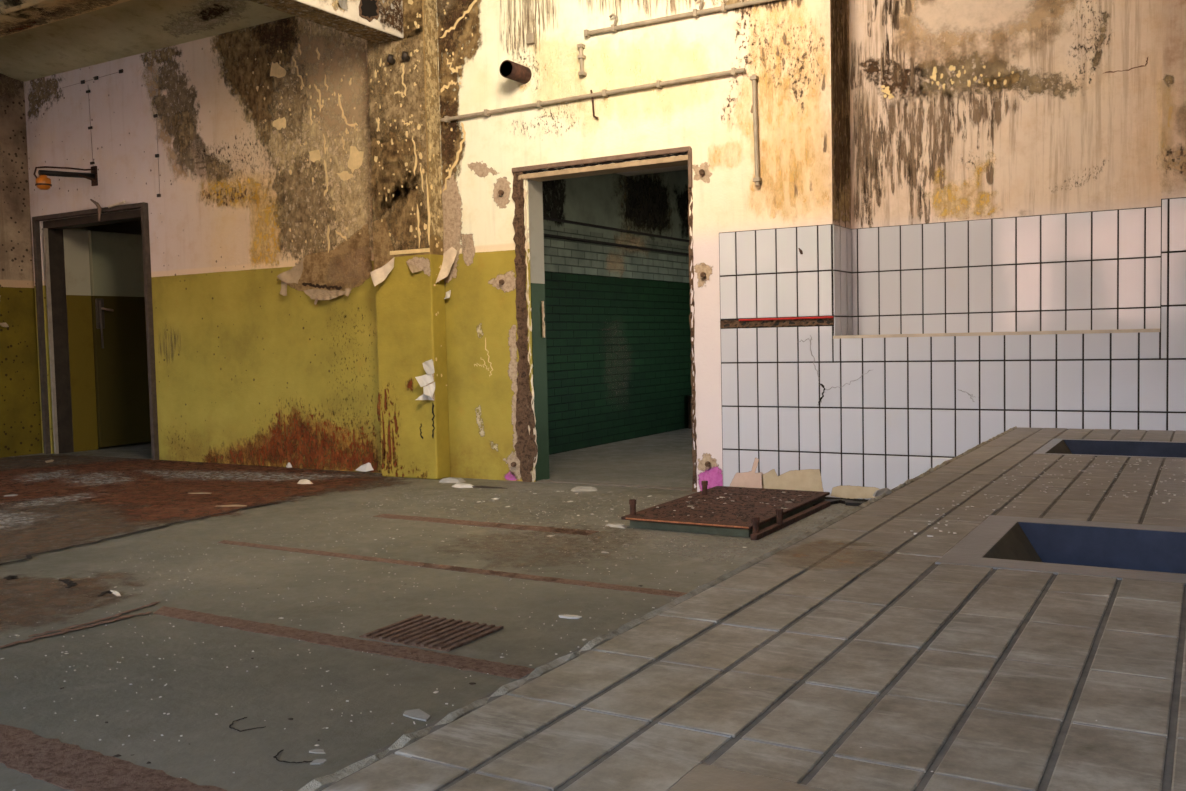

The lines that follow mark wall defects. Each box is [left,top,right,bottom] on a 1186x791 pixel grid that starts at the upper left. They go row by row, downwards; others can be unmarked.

water stain [500,0,556,89]
water stain [588,0,691,16]
water stain [141,0,482,265]
water stain [713,0,1110,228]
peeling [277,173,475,305]
spalling [468,161,511,208]
spalling [488,270,516,293]
water stain [541,179,566,226]
water stain [610,173,689,271]
crack [798,335,871,405]
rust [0,383,427,565]
spalling [730,458,879,499]